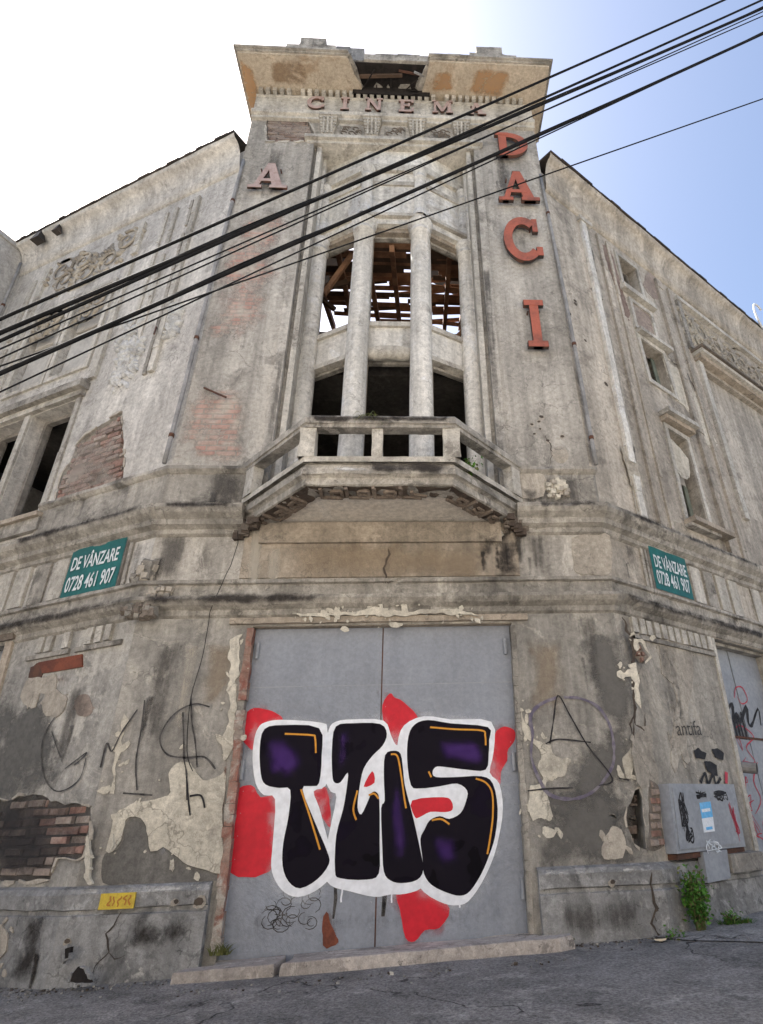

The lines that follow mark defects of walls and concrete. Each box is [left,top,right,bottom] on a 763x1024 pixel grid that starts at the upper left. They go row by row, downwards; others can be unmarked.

water stain [273,63,302,82]
spalling [54,410,126,499]
crack [383,549,394,583]
peeling [292,604,483,632]
peeling [617,632,697,778]
peeling [0,634,249,893]
peeling [519,700,575,838]
peeling [599,724,665,871]
crack [93,912,125,972]
crack [650,873,660,936]